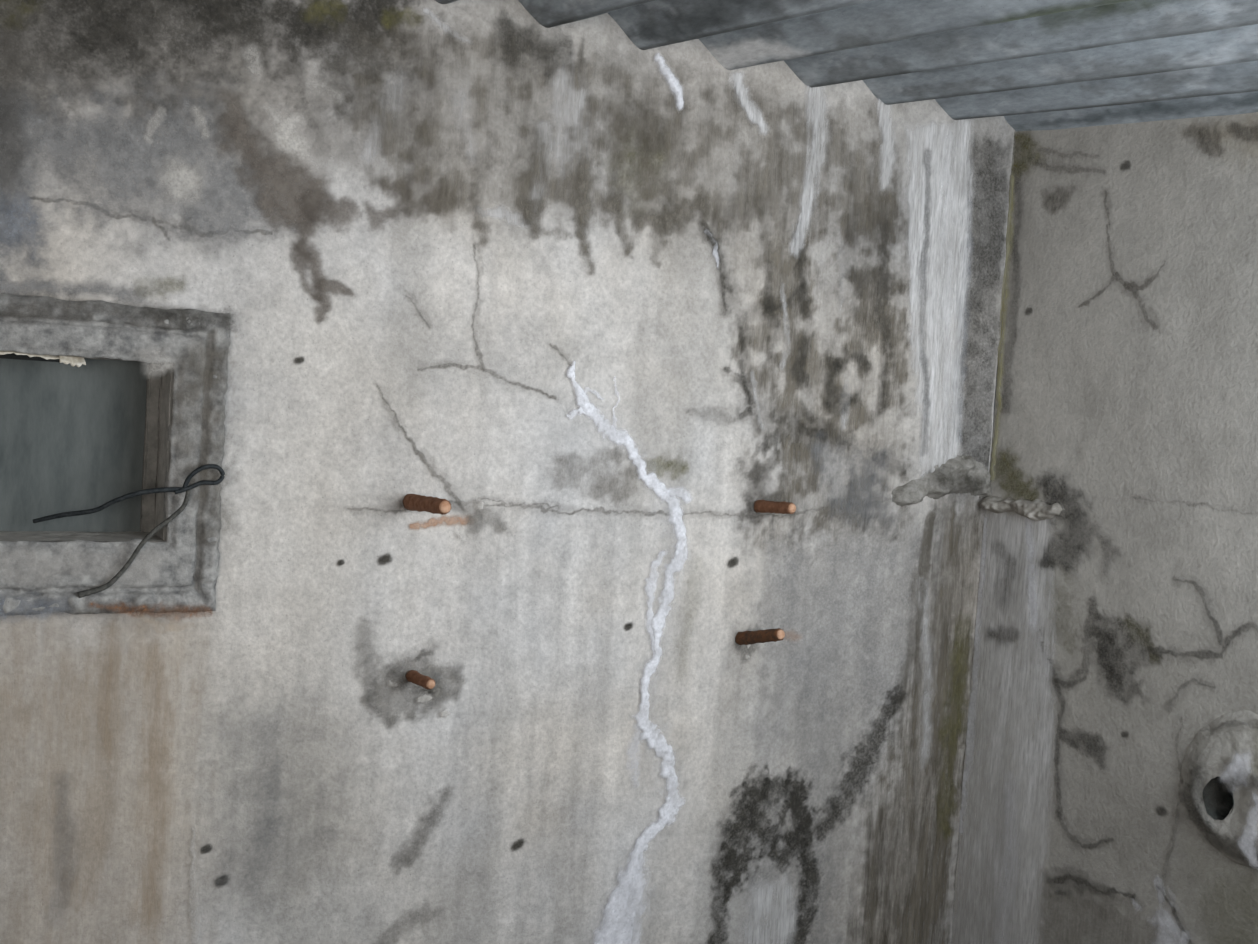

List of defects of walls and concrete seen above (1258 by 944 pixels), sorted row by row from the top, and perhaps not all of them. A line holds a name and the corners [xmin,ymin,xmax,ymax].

leakage [0,0,412,322]
crack [1079,191,1158,328]
crack [435,297,556,399]
crack [382,394,463,509]
leakage [325,51,1104,944]
leakage [1086,599,1146,703]
crack [1150,611,1245,656]
crack [1047,658,1065,800]
crack [1052,875,1135,899]
leakage [1155,879,1187,944]